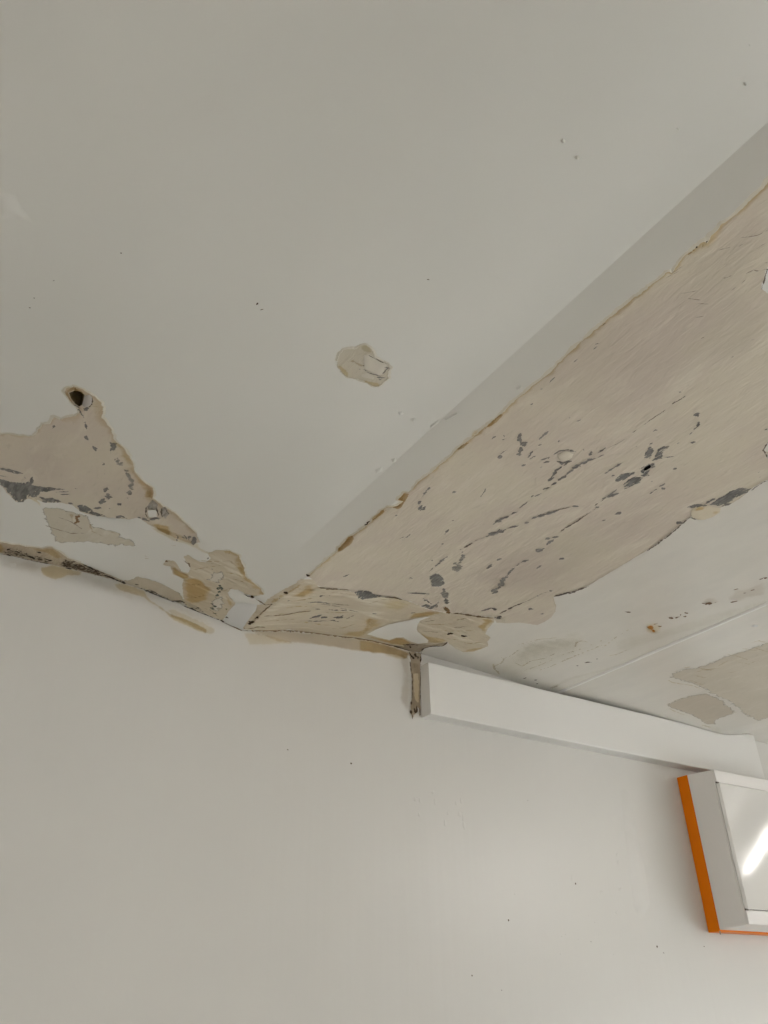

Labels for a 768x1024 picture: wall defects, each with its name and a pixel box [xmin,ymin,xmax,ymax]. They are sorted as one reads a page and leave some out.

peeling [0,176,768,652]
water stain [3,549,221,621]
peeling [668,643,768,724]